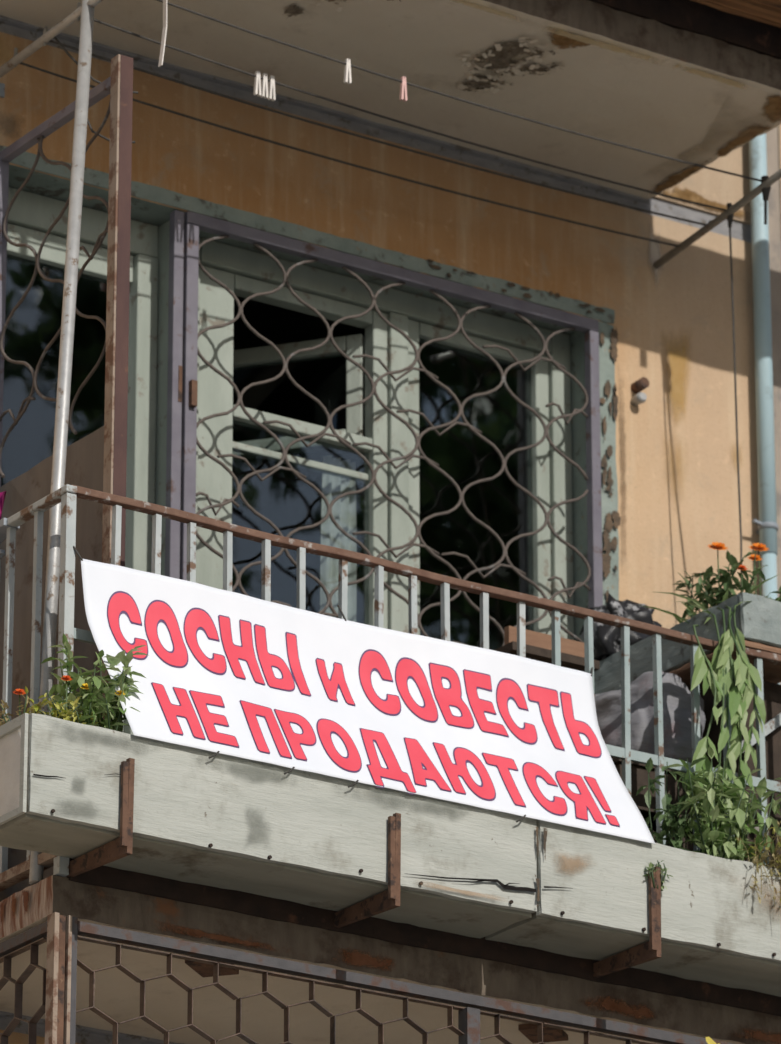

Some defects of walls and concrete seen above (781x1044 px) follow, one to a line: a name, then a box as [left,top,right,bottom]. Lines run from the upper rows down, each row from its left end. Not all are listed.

peeling [285,0,401,18]
peeling [457,33,590,94]
rust [654,96,781,193]
peeling [600,327,618,362]
peeling [600,380,618,496]
peeling [602,511,621,602]
crack [404,873,573,892]